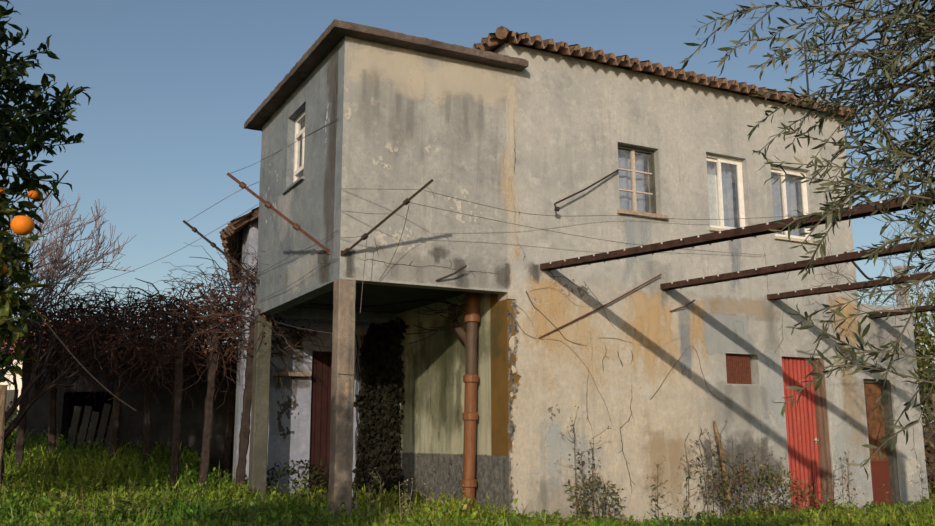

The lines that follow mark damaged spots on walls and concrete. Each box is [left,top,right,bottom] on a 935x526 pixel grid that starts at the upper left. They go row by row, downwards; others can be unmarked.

peeling [374,226,422,254]
spalling [507,297,545,514]